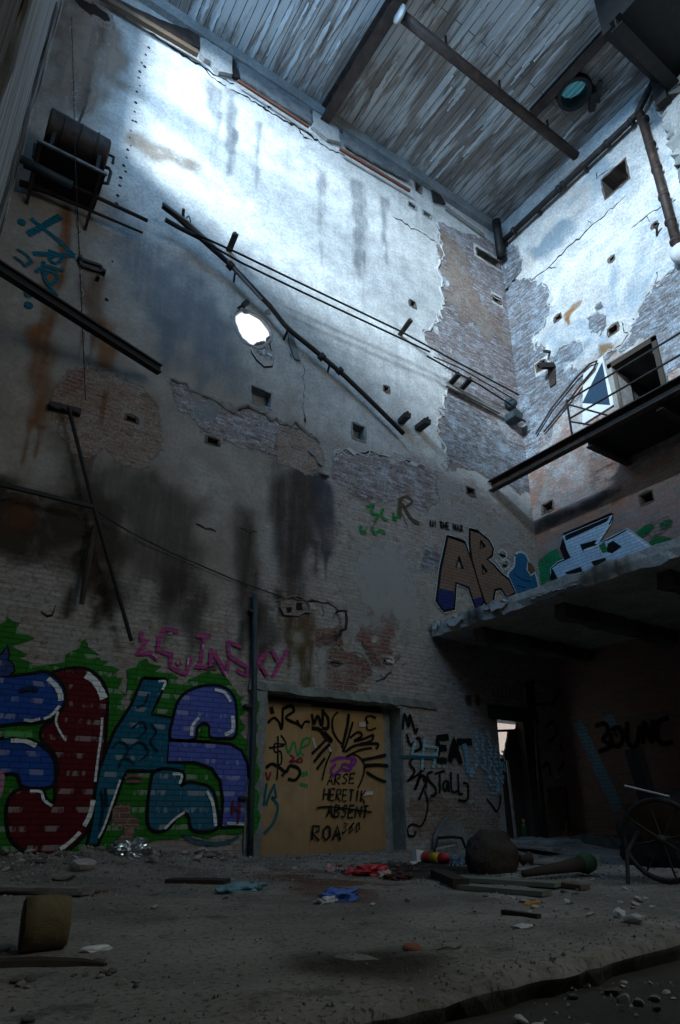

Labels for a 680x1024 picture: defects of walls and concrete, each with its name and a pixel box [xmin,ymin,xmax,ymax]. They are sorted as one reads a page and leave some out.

spalling [169,0,680,515]
crack [473,195,626,303]
spalling [48,355,164,469]
water stain [0,456,205,638]
water stain [237,470,333,687]
spalling [315,606,401,693]